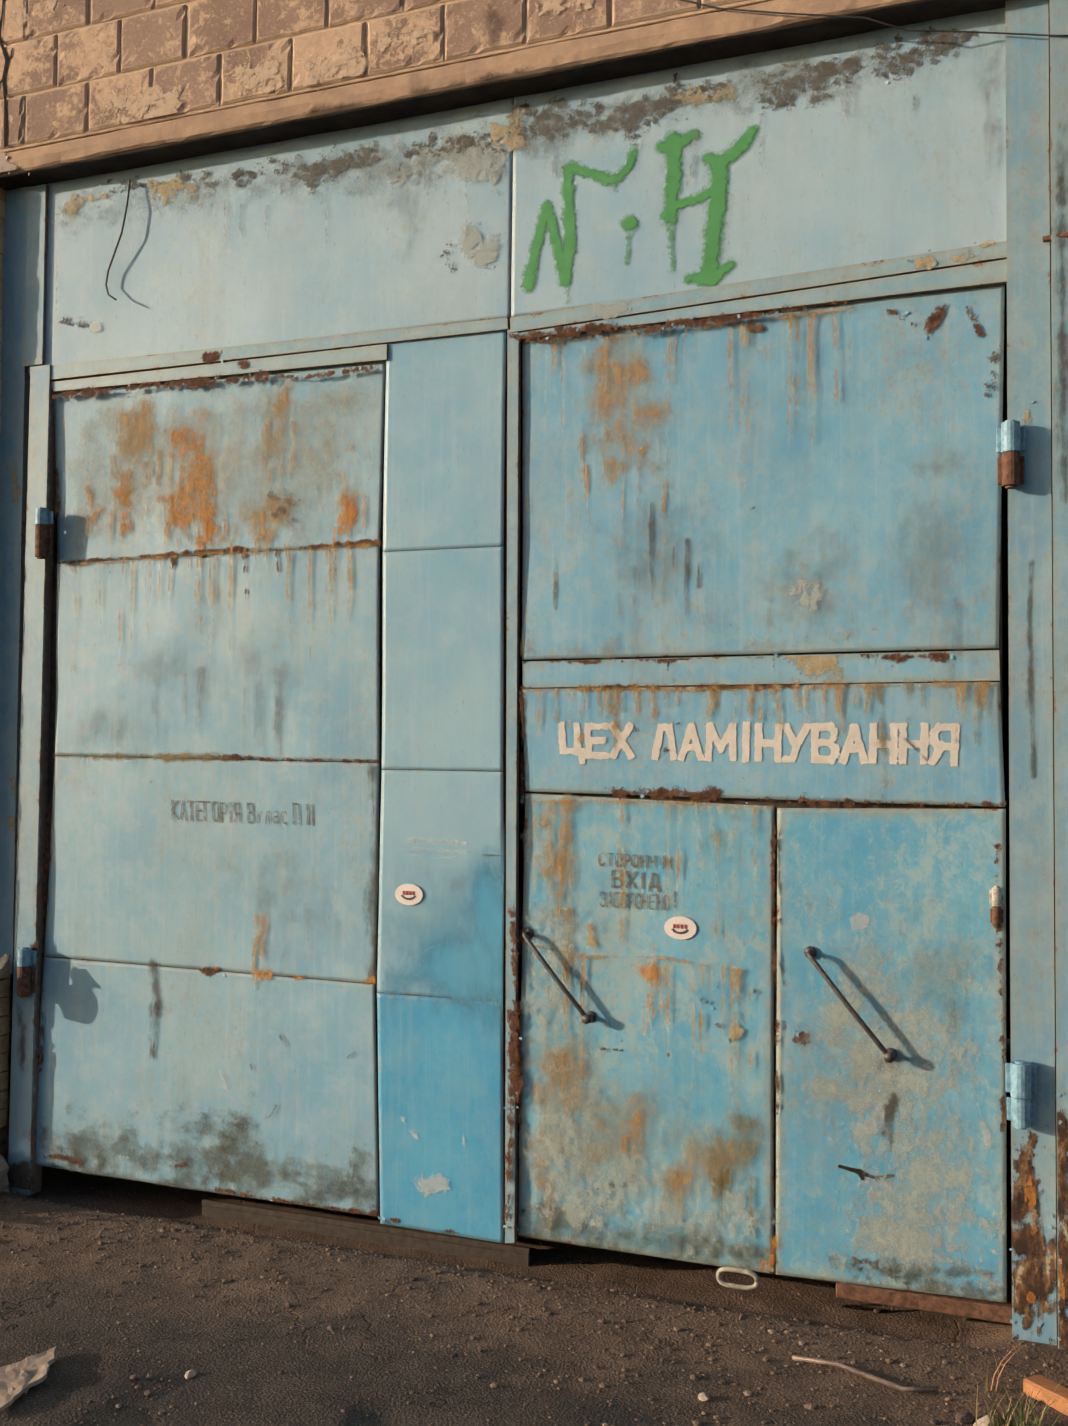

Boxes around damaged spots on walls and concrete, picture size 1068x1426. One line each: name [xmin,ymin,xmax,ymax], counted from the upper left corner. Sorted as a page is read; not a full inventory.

crack [0,0,13,147]
peeling [56,14,977,218]
corrosion [509,300,847,422]
corrosion [52,350,382,607]
corrosion [523,658,701,670]
corrosion [860,649,954,667]
corrosion [42,812,51,919]
corrosion [518,683,888,925]
corrosion [503,890,608,1231]
corrosion [636,956,702,1033]
corrosion [664,1116,758,1230]
corrosion [1000,1093,1068,1351]